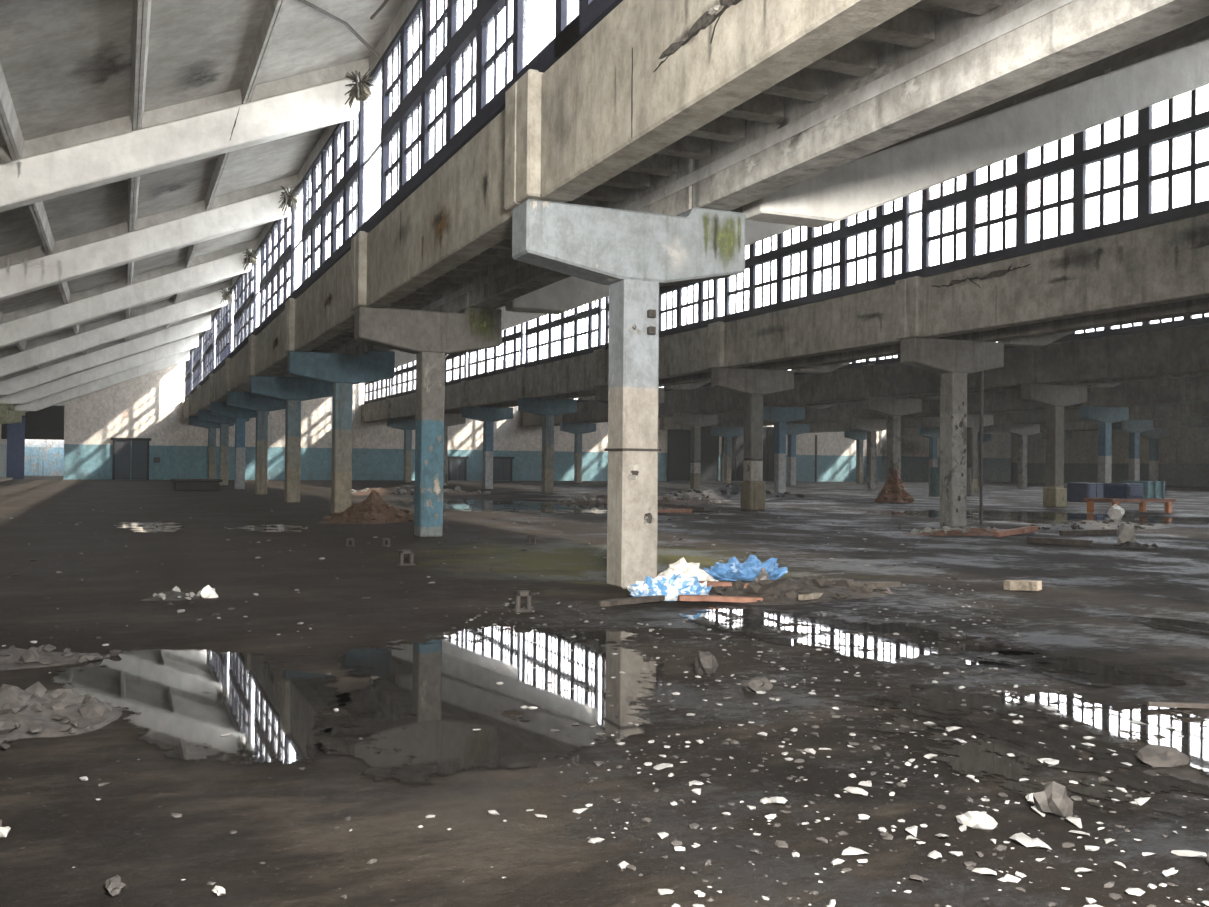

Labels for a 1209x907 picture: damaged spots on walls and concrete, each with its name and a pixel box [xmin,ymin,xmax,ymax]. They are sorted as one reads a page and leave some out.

crack [631,0,742,138]
water stain [704,216,741,254]